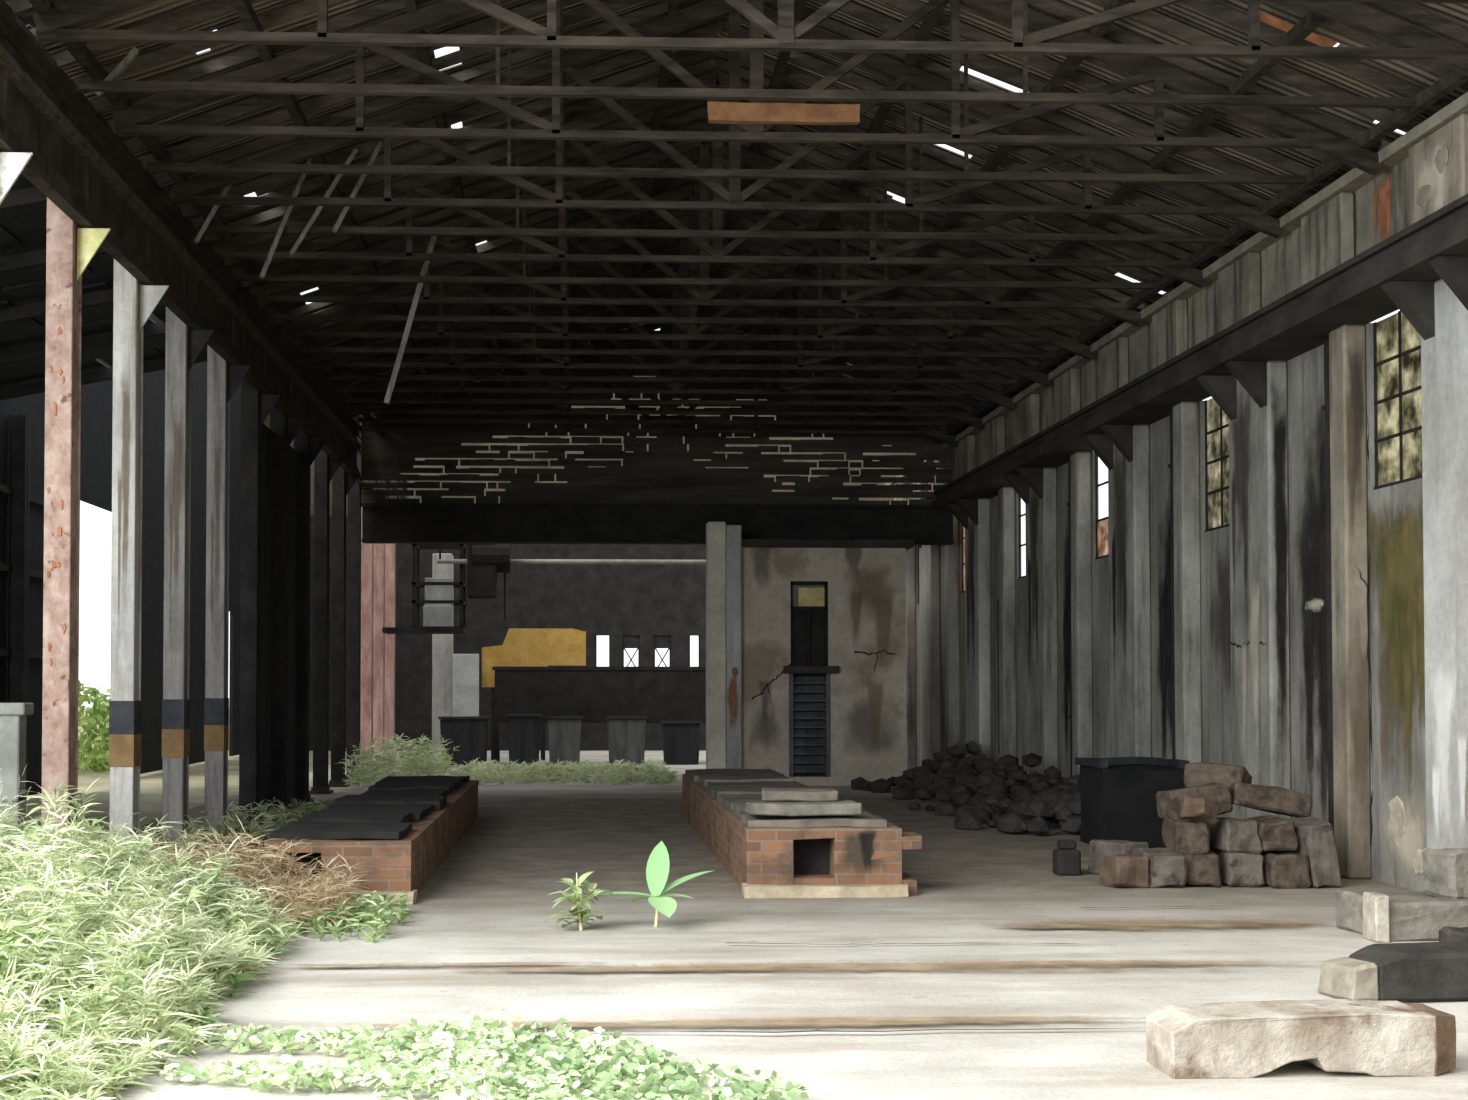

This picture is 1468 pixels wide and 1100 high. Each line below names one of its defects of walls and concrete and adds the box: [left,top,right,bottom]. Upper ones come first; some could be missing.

leakage [1217,412,1259,749]
leakage [1278,509,1327,760]
leakage [1354,582,1466,832]